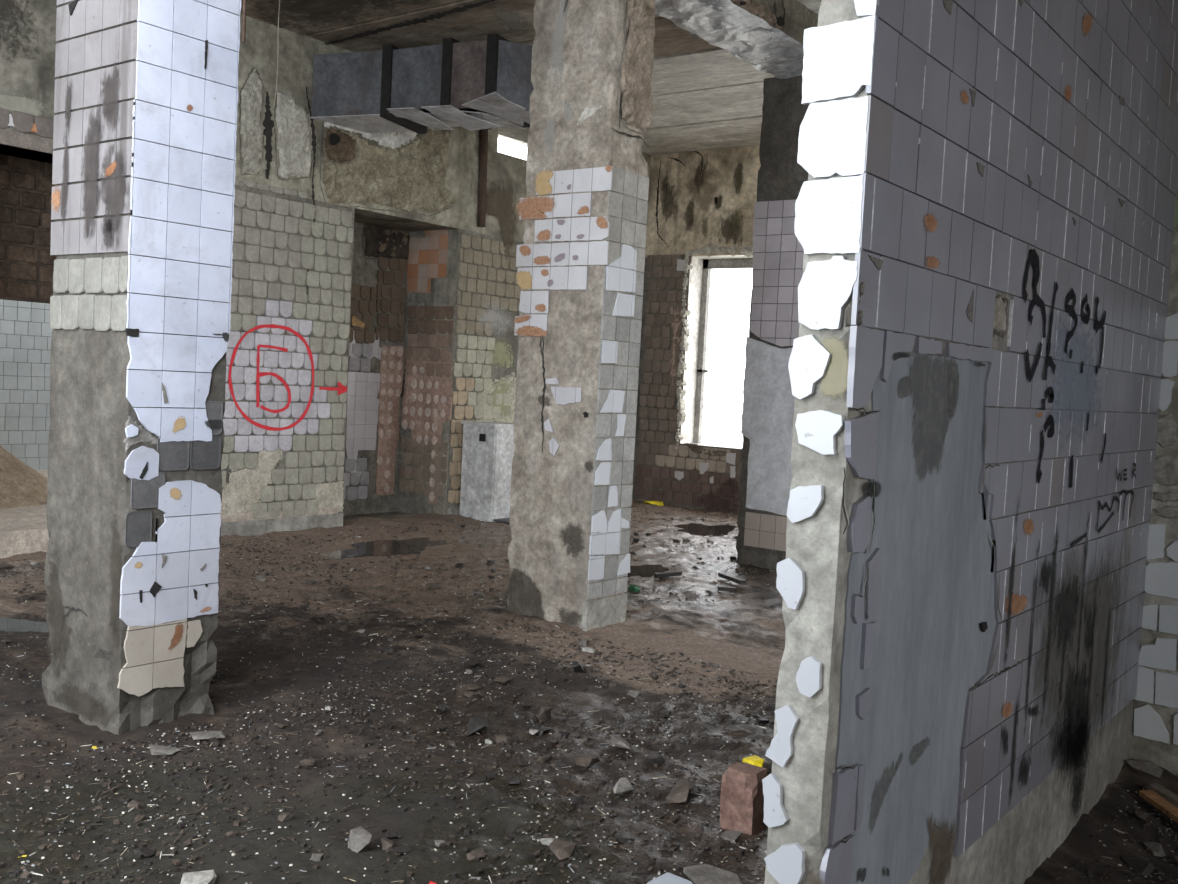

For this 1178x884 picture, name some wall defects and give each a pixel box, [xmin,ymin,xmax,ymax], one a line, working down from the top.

water stain [61,64,129,248]
spalling [845,282,866,327]
peeling [123,414,158,453]
crack [538,336,546,453]
spalling [139,582,162,603]
water stain [1002,515,1111,817]